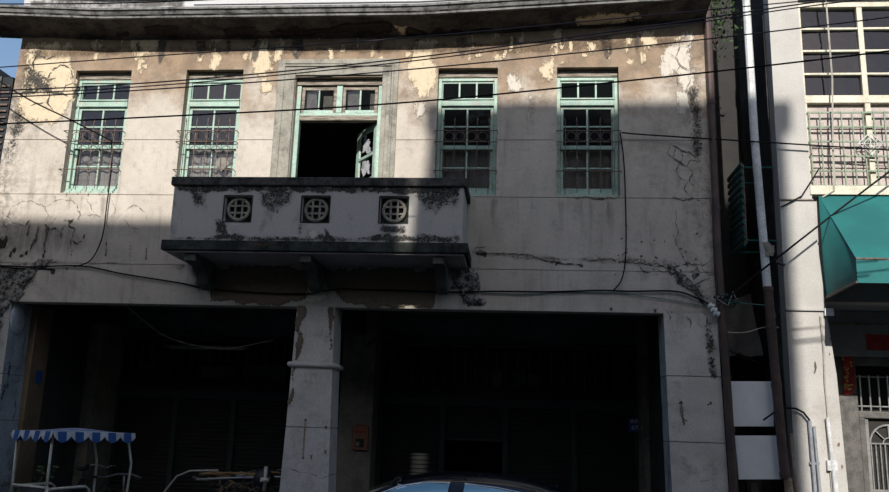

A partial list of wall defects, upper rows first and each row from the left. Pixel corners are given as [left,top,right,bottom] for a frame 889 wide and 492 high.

peeling [16,41,78,126]
peeling [121,40,159,75]
peeling [197,27,295,94]
peeling [394,24,525,120]
peeling [537,29,596,82]
peeling [624,29,697,125]
damp [688,85,703,168]
crack [3,198,147,250]
damp [177,186,460,218]
damp [204,219,460,243]
crack [472,140,715,285]
damp [704,322,718,379]